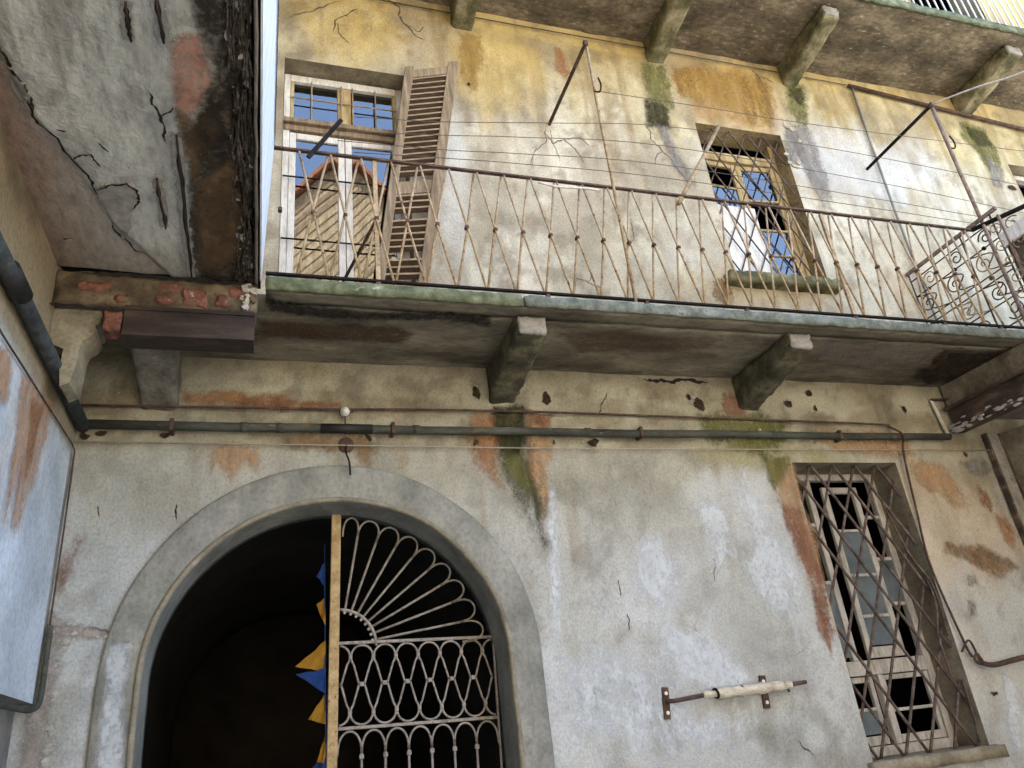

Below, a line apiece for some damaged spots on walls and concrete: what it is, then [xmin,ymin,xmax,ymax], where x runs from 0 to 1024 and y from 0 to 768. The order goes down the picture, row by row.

crack [0,50,109,195]
leakage [176,0,254,283]
crack [531,128,592,164]
leakage [642,62,690,180]
leakage [961,122,1004,188]
flaking render [77,281,128,340]
rust [0,348,50,527]
rust [184,391,325,408]
crack [644,377,707,385]
hole [685,393,705,411]
leakage [491,406,560,617]
rust [761,455,832,649]